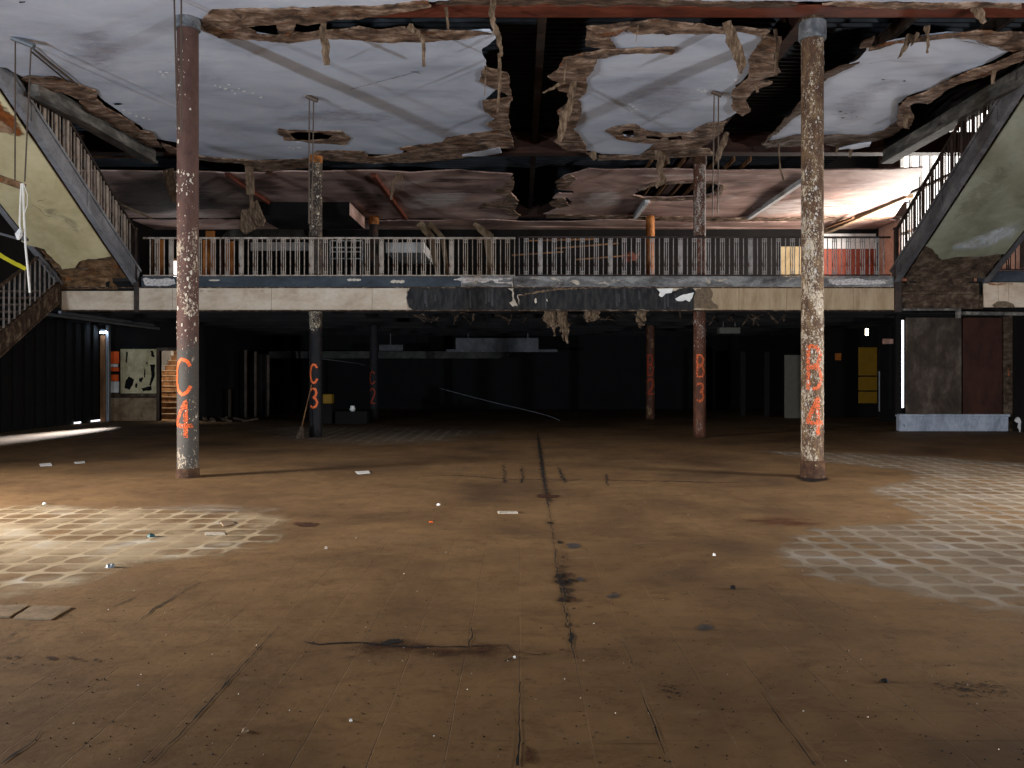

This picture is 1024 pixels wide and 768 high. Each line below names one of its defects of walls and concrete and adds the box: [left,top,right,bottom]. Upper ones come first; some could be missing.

peeling [479,67,513,101]
peeling [731,78,773,116]
peeling [598,144,713,161]
peeling [391,277,718,347]
crack [305,433,577,766]